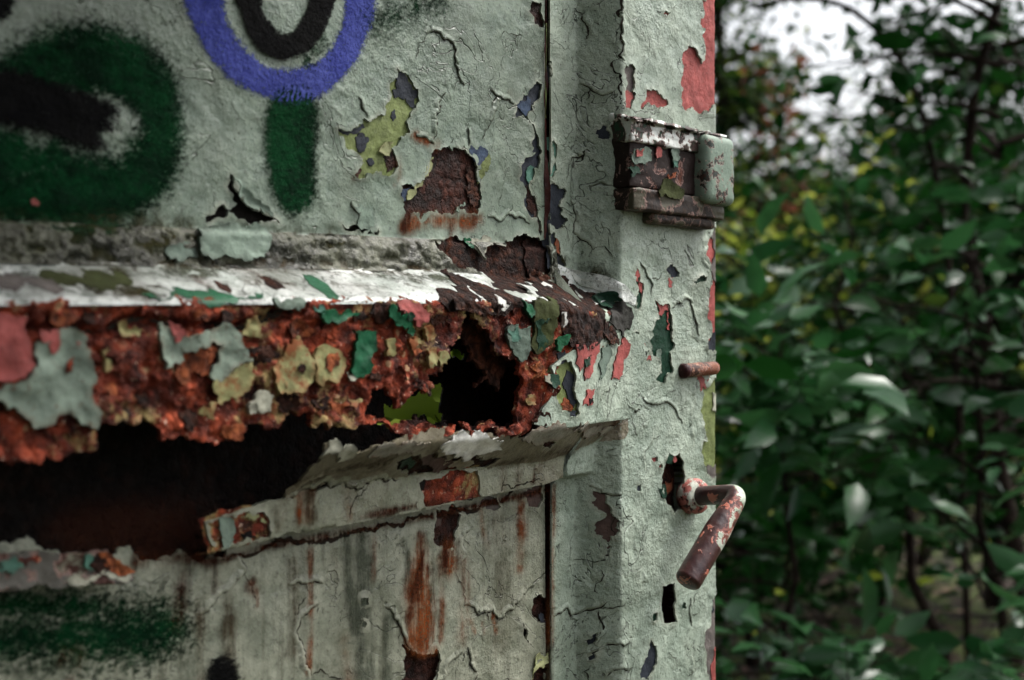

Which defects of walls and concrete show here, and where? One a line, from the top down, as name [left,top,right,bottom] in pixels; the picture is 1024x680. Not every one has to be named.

crack [415,25,514,147]
crack [576,0,627,110]
peeling [681,0,715,114]
spalling [0,65,643,562]
rust [400,134,606,392]
peeling [645,301,673,383]
peeling [694,227,716,351]
rust [406,414,521,438]
peeling [652,453,683,498]
crack [195,468,546,620]
rust [297,452,556,656]
crack [553,483,632,680]